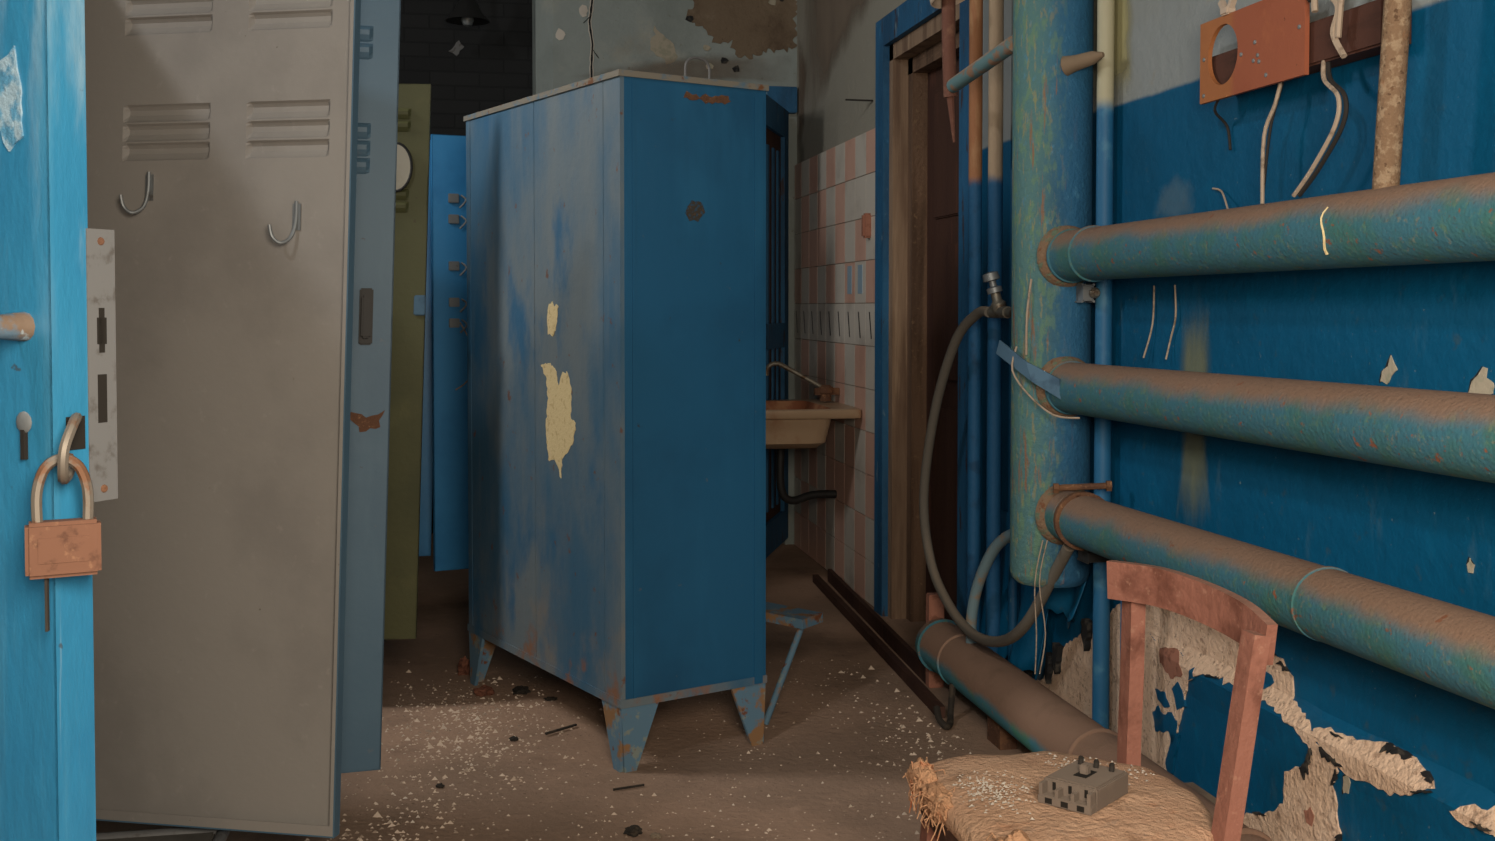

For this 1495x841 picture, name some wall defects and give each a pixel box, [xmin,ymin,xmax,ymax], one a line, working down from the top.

flaking render [685,0,797,72]
peeling [1379,354,1398,384]
peeling [1468,366,1494,394]
flaking render [1141,605,1239,774]
flaking render [1243,653,1435,841]
flaking render [1449,804,1495,837]